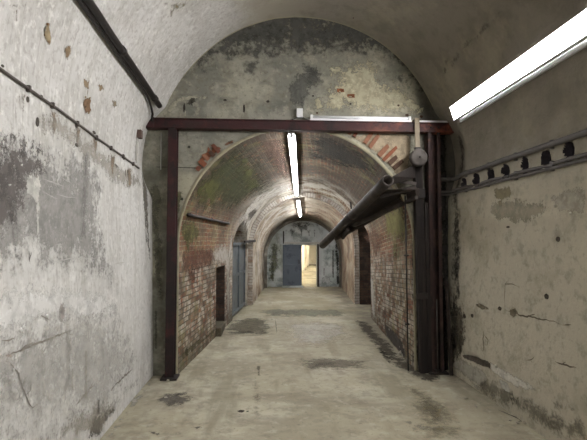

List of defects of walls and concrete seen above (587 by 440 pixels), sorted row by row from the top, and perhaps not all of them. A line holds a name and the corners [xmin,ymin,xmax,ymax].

leakage [289,66,324,108]
flaking render [314,60,424,114]
spalling [195,140,233,171]
spalling [347,133,411,174]
crack [499,282,571,326]
leakage [227,318,269,334]
crack [1,328,76,409]